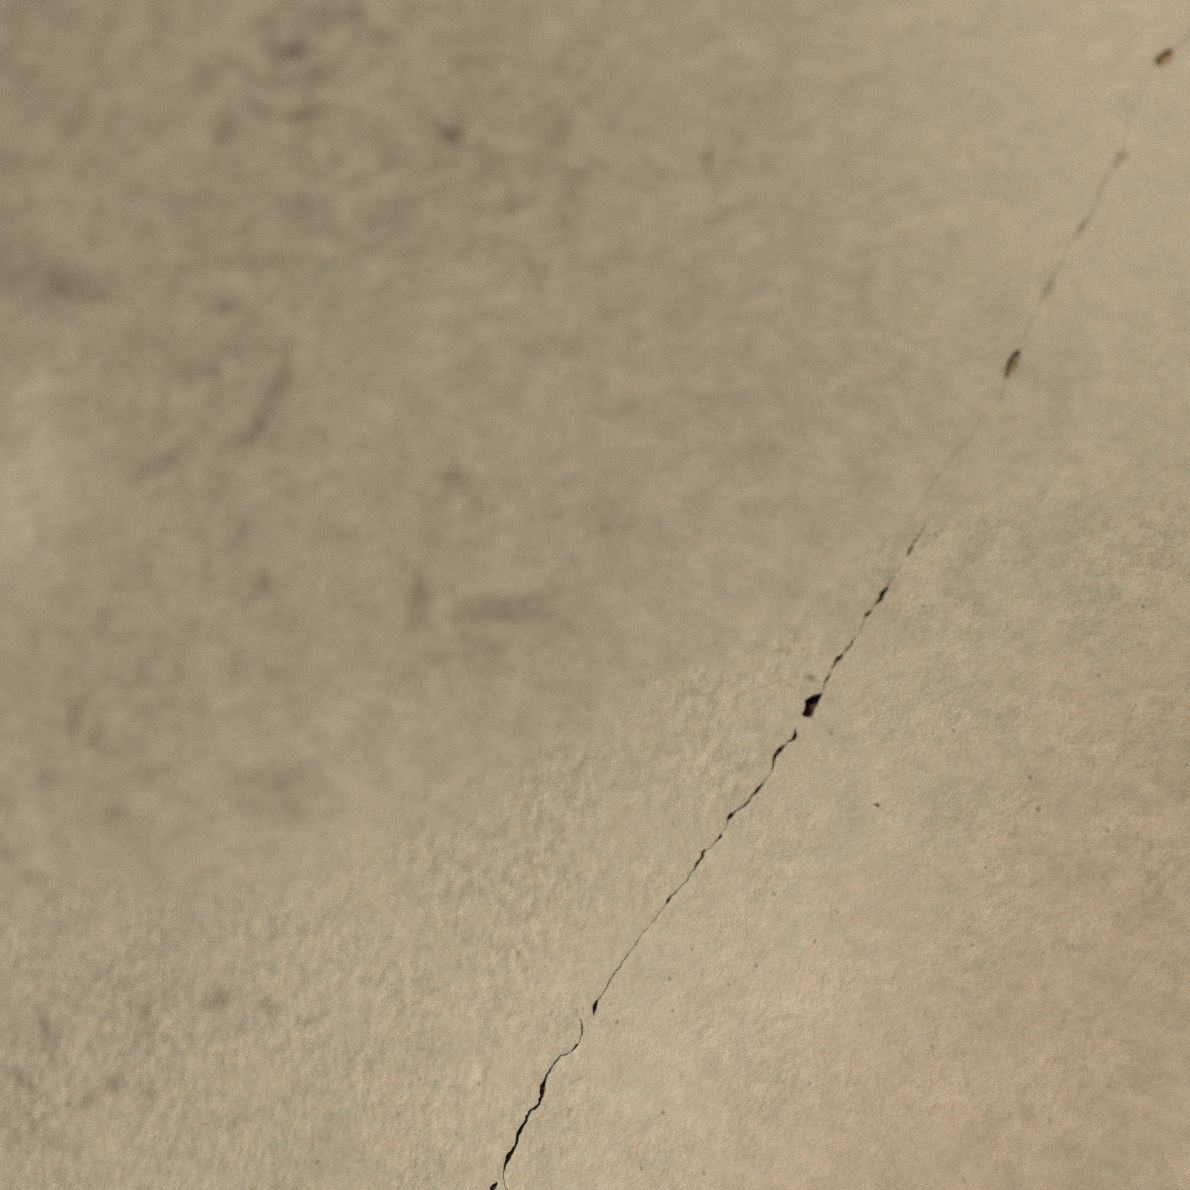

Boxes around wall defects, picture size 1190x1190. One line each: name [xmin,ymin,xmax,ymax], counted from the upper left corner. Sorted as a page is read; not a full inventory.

crack [1014,22,1190,347]
crack [800,385,1010,690]
crack [490,728,797,1190]